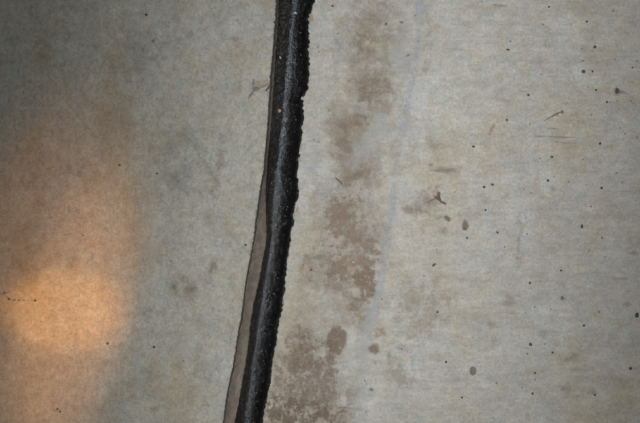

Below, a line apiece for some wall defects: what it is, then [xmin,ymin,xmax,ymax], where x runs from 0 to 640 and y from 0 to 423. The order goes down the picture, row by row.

crack [222,0,279,423]
damp [327,326,346,355]